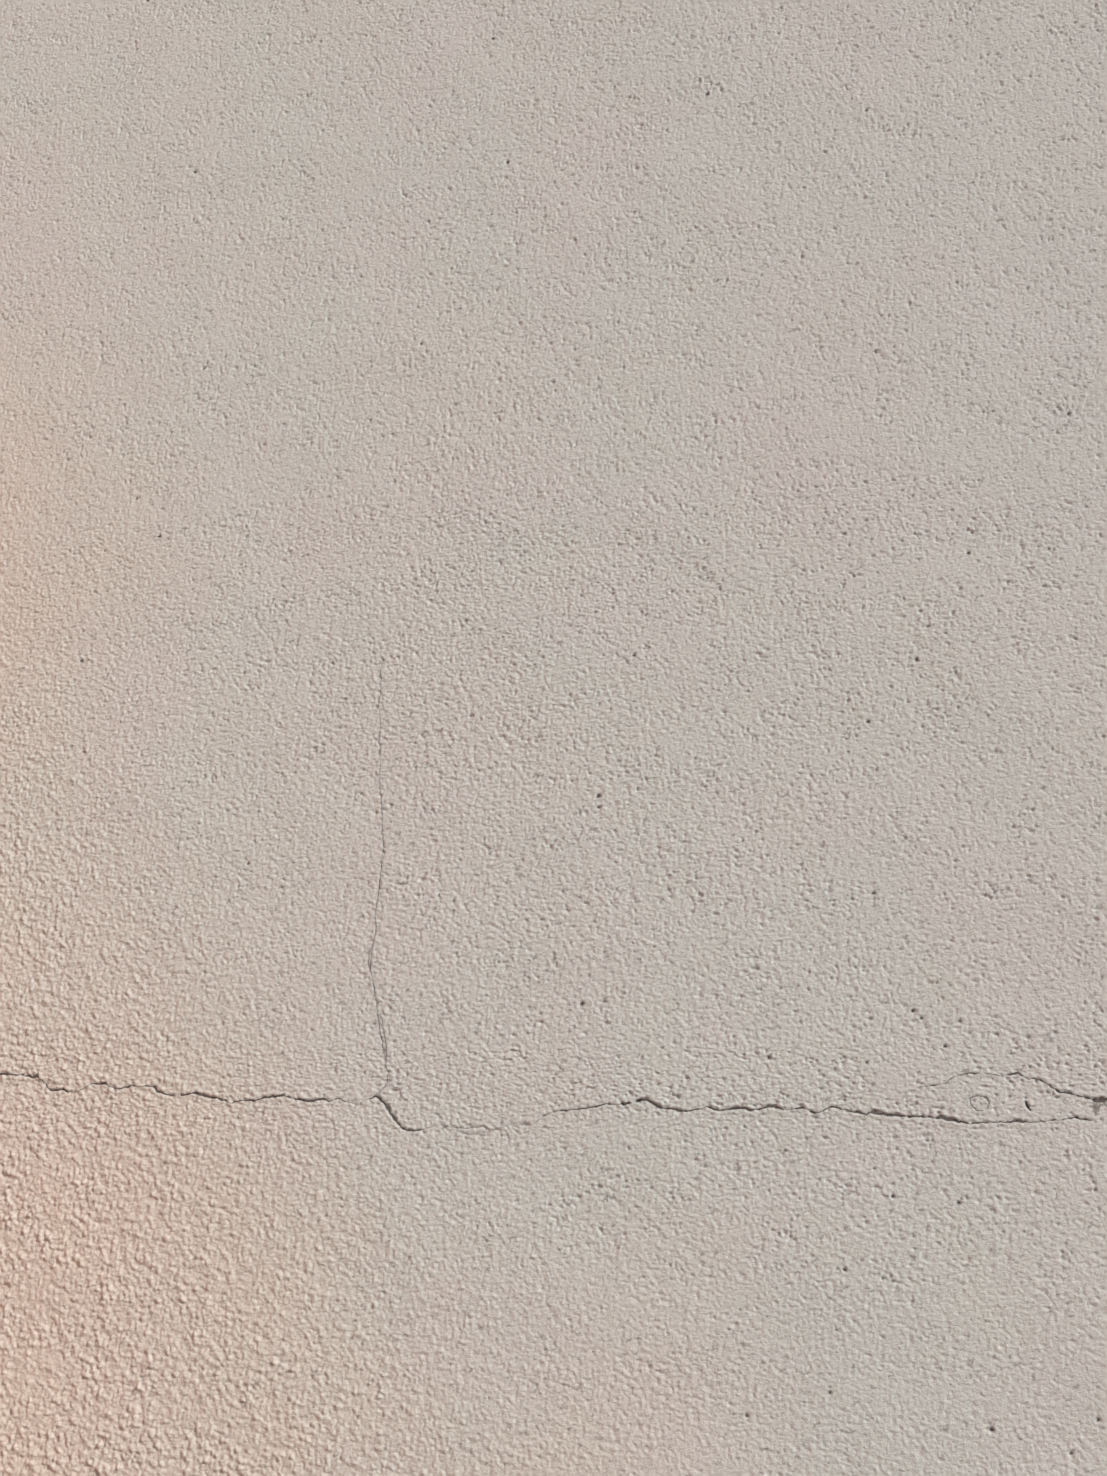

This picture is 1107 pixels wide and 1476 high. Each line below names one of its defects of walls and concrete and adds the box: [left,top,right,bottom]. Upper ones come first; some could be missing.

crack [0,657,1107,1131]